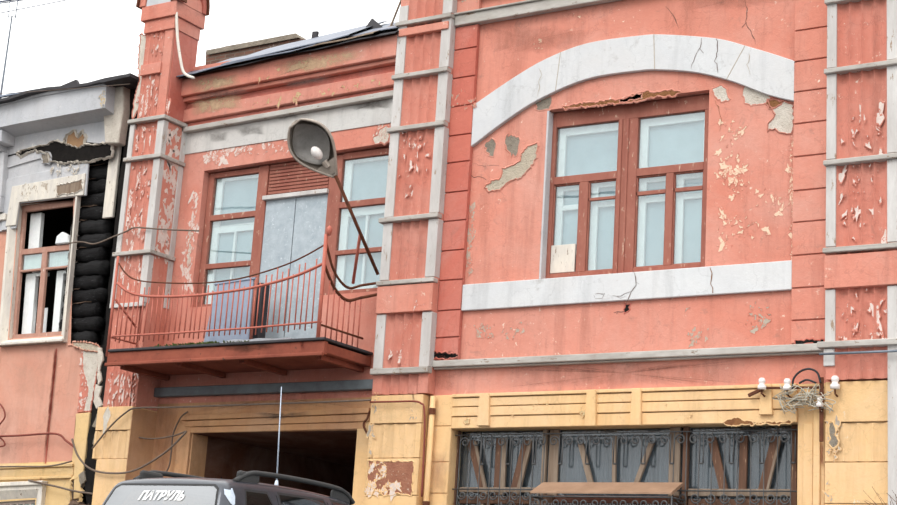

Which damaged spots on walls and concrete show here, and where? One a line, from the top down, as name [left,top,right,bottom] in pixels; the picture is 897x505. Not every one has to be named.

flaking render [535,88,682,112]
spalling [16,33,181,297]
flaking render [483,133,540,193]
flaking render [711,85,794,260]
peeling [838,99,885,242]
peeling [465,201,477,277]
peeling [838,287,887,348]
flaking render [72,341,100,412]
flaking render [102,370,139,438]
flaking render [363,393,415,503]
flaking render [721,416,792,427]
flaking render [824,413,842,462]